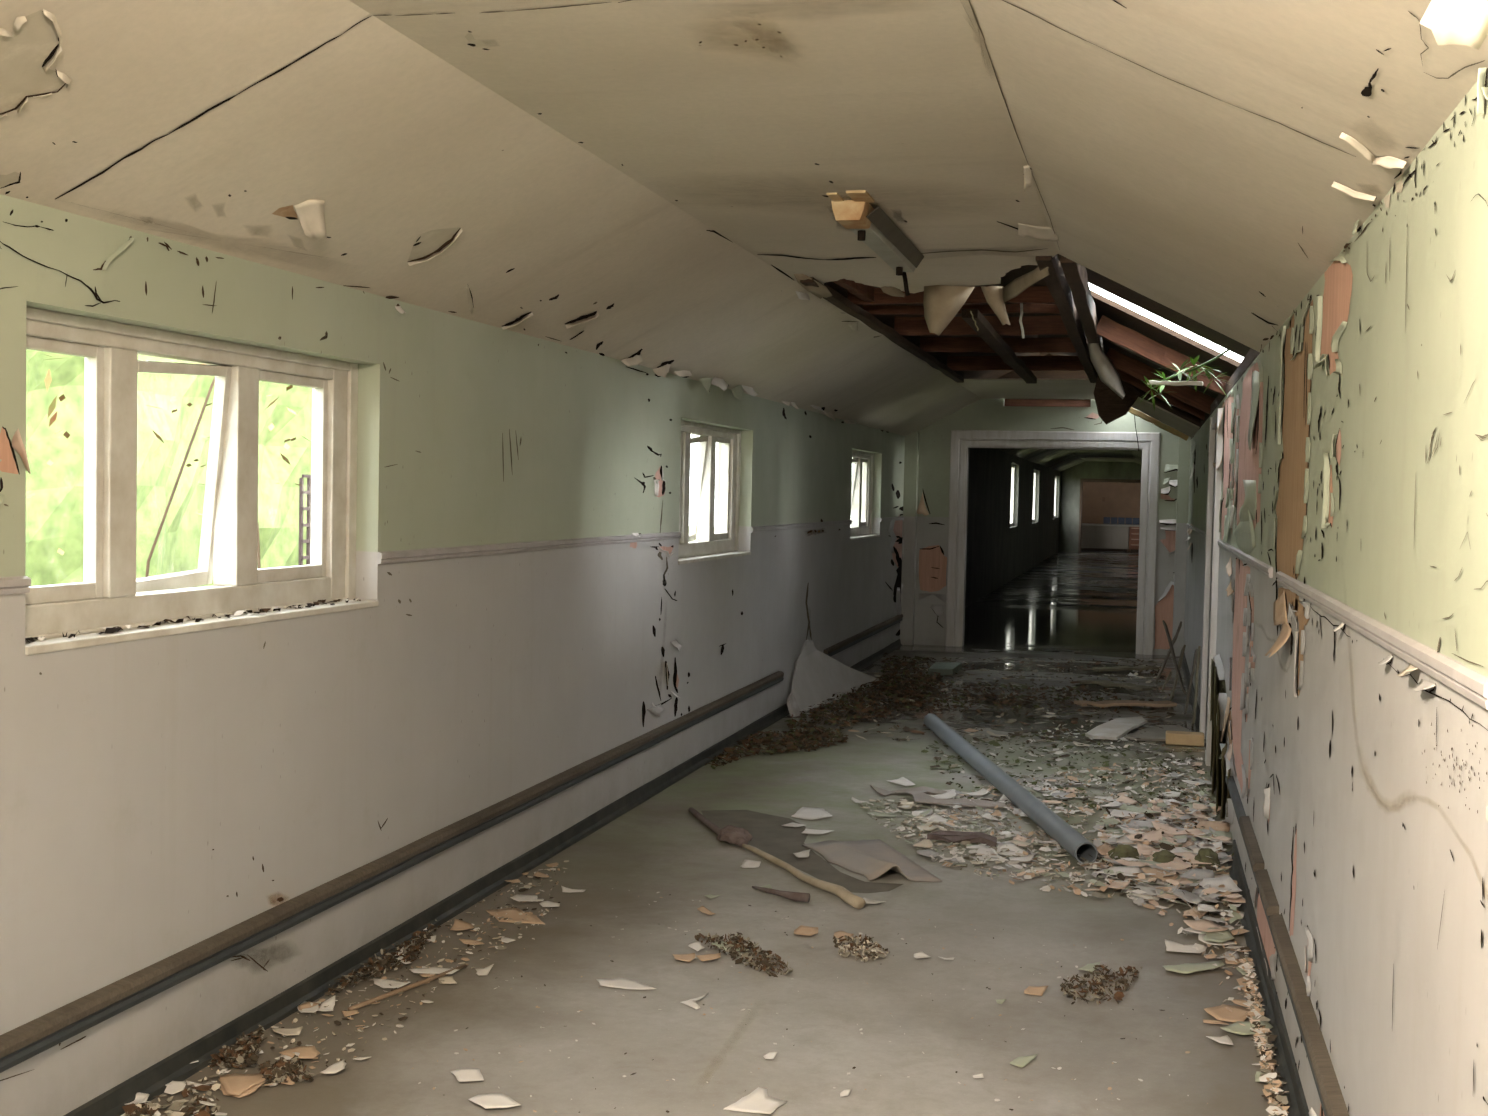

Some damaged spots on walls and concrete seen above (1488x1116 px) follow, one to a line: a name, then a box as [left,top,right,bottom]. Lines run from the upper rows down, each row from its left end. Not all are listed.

peeling [0,9,72,117]
peeling [272,199,331,240]
peeling [408,227,463,266]
peeling [0,427,31,474]
peeling [630,533,674,560]
peeling [1033,181,1396,980]
peeling [1378,654,1487,730]
crack [1255,690,1376,791]
crack [1437,850,1484,948]